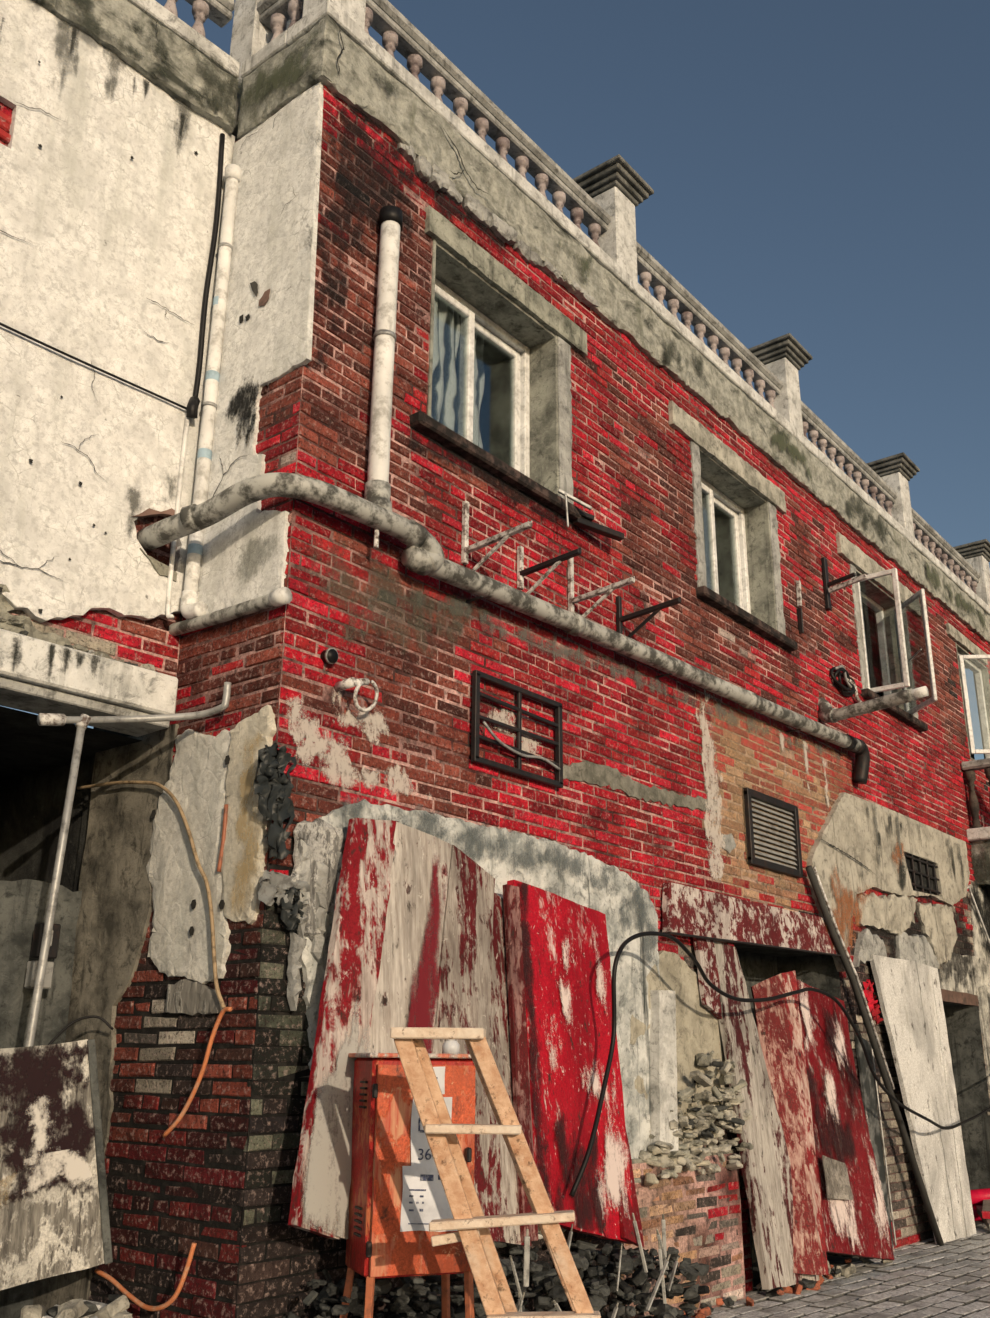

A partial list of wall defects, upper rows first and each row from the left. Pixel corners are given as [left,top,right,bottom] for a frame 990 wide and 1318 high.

damp [56,9,142,95]
damp [134,67,170,95]
damp [174,88,218,150]
damp [225,379,261,446]
damp [13,638,22,671]
damp [49,644,99,676]
spalling [0,584,156,672]
peeling [146,705,277,1016]
damp [867,807,906,890]
damp [947,839,990,962]